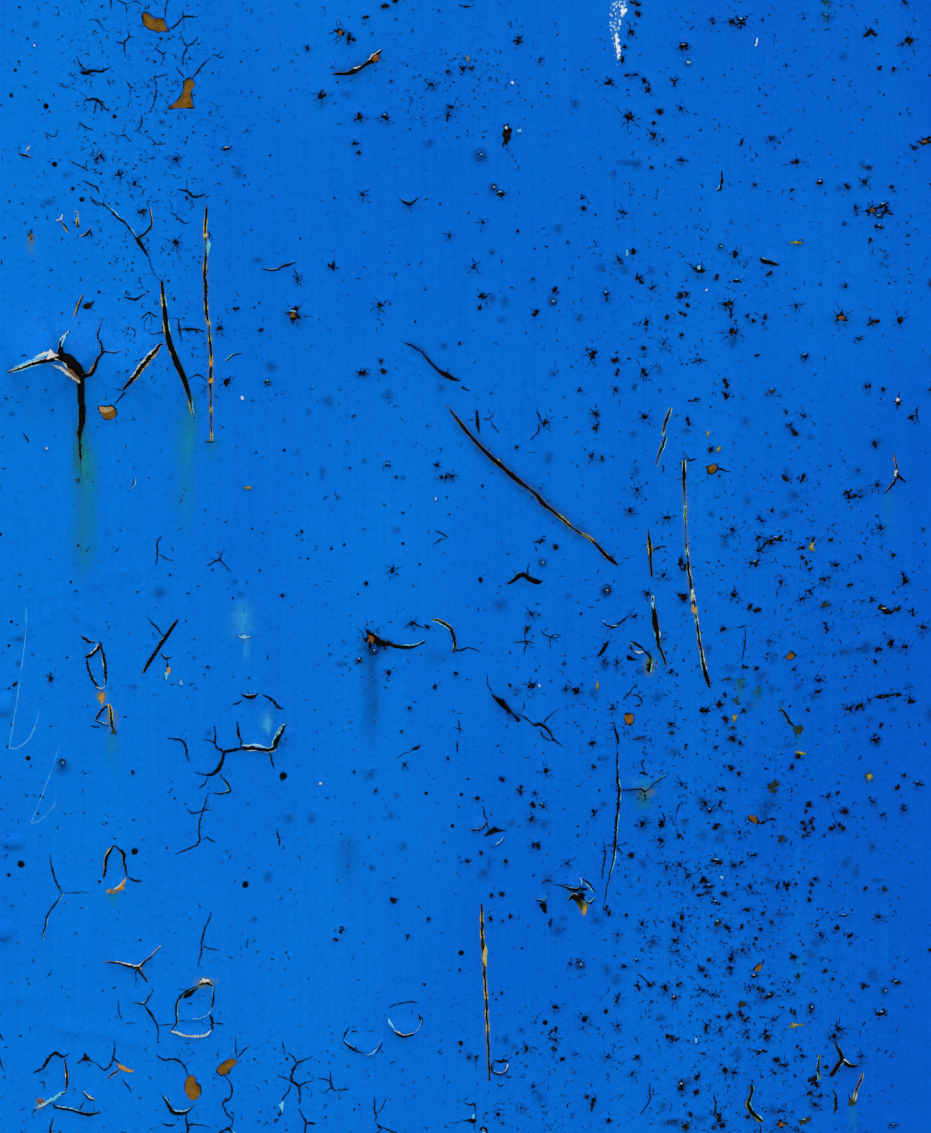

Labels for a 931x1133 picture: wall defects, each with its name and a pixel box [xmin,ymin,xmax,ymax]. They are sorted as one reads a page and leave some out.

peeling [162,71,202,116]
corrosion [26,4,230,384]
crack [0,0,271,495]
corrosion [508,108,787,415]
crack [142,618,205,698]
crack [165,726,250,882]
corrosion [562,403,927,1133]
peeling [33,1045,71,1133]
crack [0,904,355,1133]
peeling [170,976,223,1040]
peeling [178,1051,245,1107]
corrosion [483,958,658,1131]